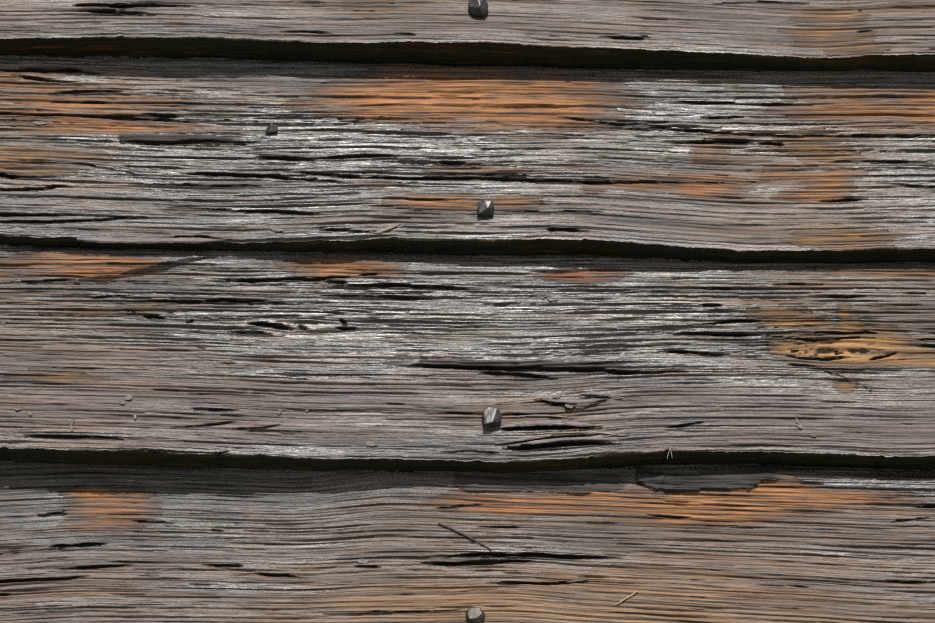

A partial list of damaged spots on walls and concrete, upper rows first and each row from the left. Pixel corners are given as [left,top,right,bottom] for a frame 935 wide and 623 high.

crack [72,2,198,16]
crack [772,282,867,299]
crack [382,286,935,454]
crack [435,504,521,529]
crack [416,551,625,586]